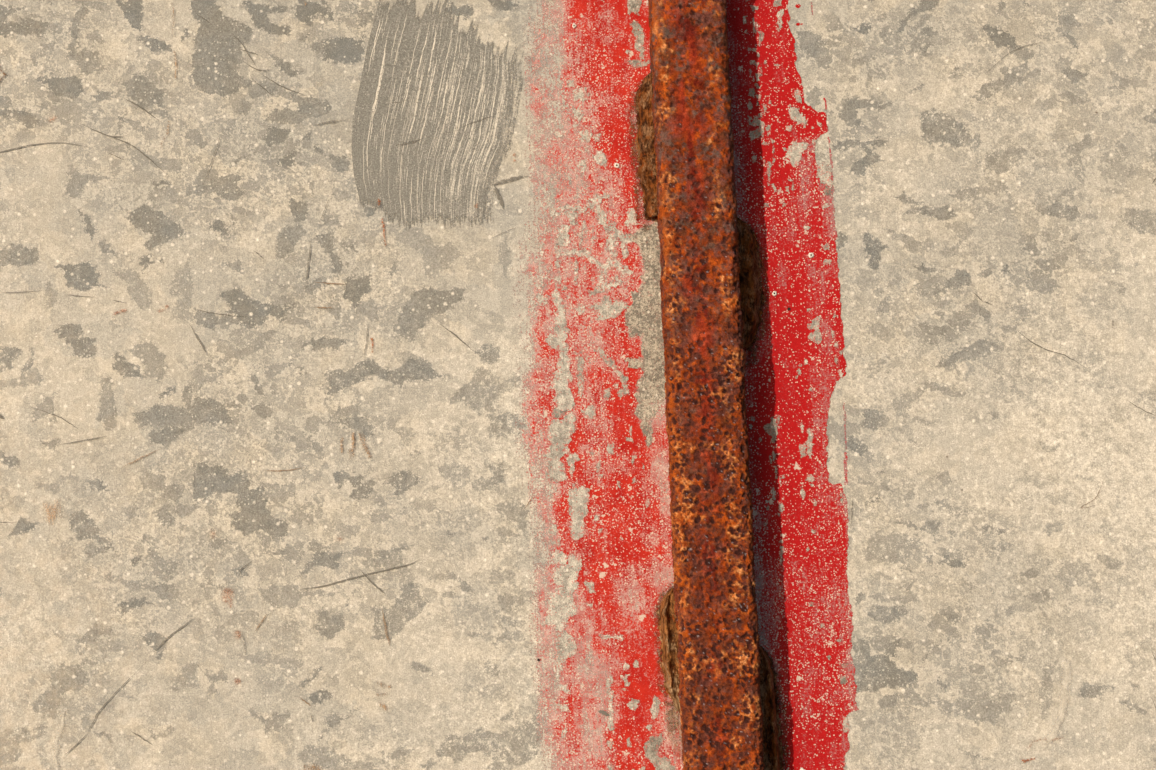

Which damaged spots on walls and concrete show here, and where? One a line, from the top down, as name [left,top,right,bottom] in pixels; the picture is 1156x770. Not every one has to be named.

peeling [625,0,651,68]
peeling [554,80,607,173]
corrosion [629,80,649,232]
peeling [743,0,822,207]
peeling [816,161,834,209]
peeling [807,308,843,378]
peeling [532,193,666,712]
peeling [750,415,785,526]
peeling [799,422,814,458]
peeling [800,474,817,506]
peeling [605,660,675,770]
corrosion [654,587,682,755]